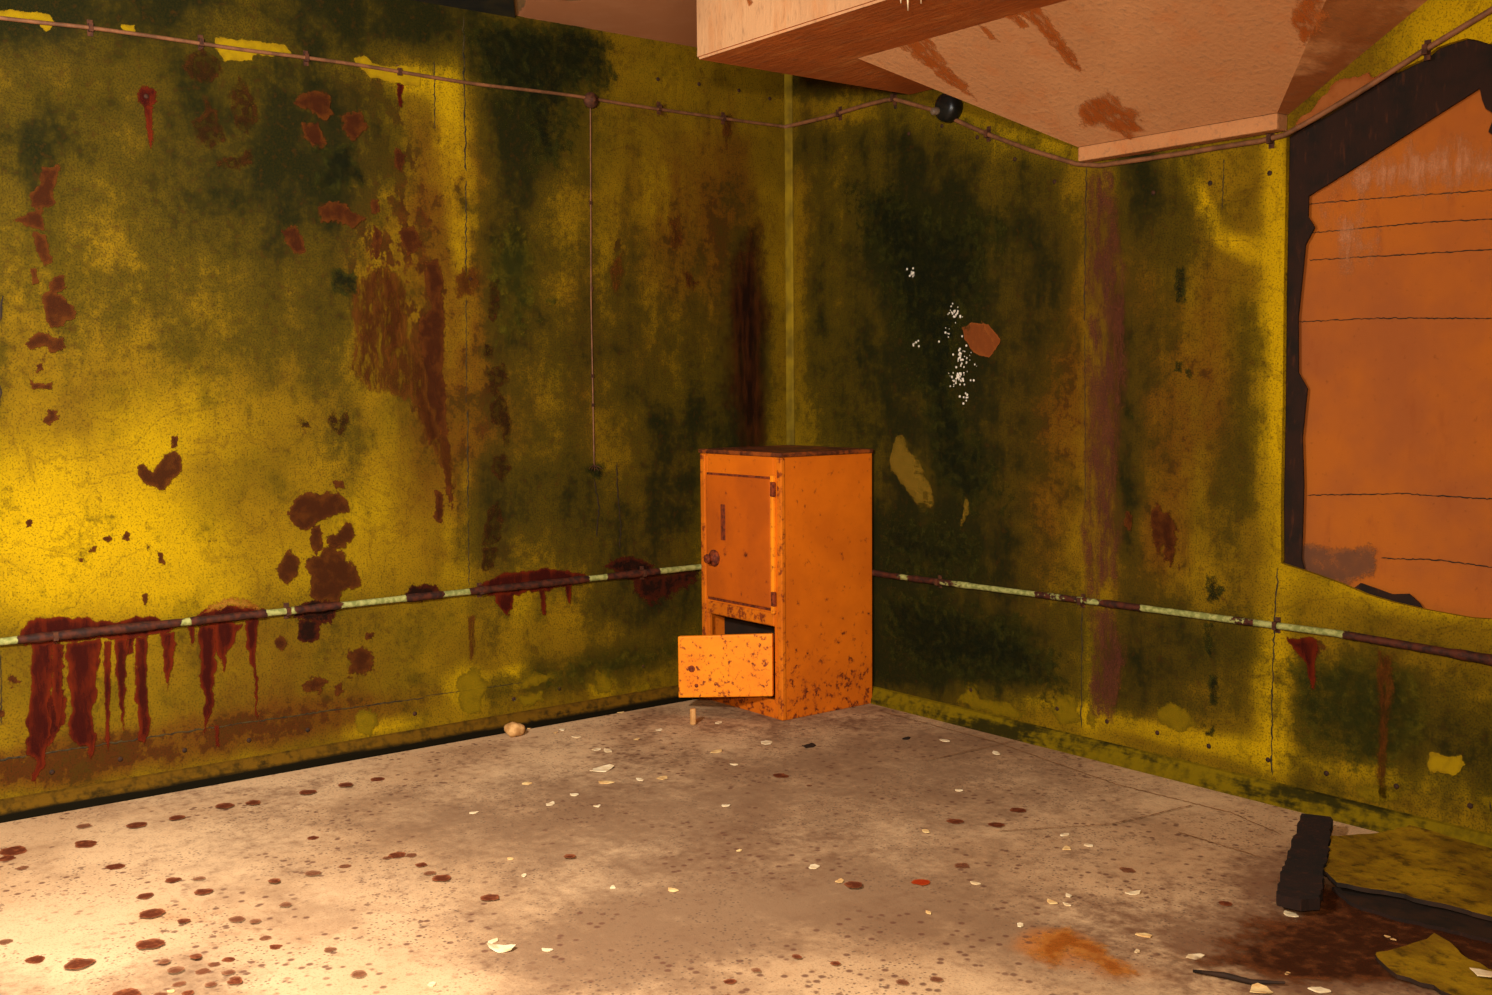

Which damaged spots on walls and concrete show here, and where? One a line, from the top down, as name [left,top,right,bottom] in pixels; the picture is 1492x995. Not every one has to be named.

peeling [215,37,291,62]
mould [463,17,618,174]
rust [352,259,478,523]
damp [846,178,1070,708]
damp [1081,170,1133,719]
damp [1174,267,1186,303]
spalling [1284,39,1492,618]
rust [20,597,264,783]
rust [293,599,336,643]
rust [478,568,586,616]
rust [603,556,699,611]
damp [1206,576,1225,601]